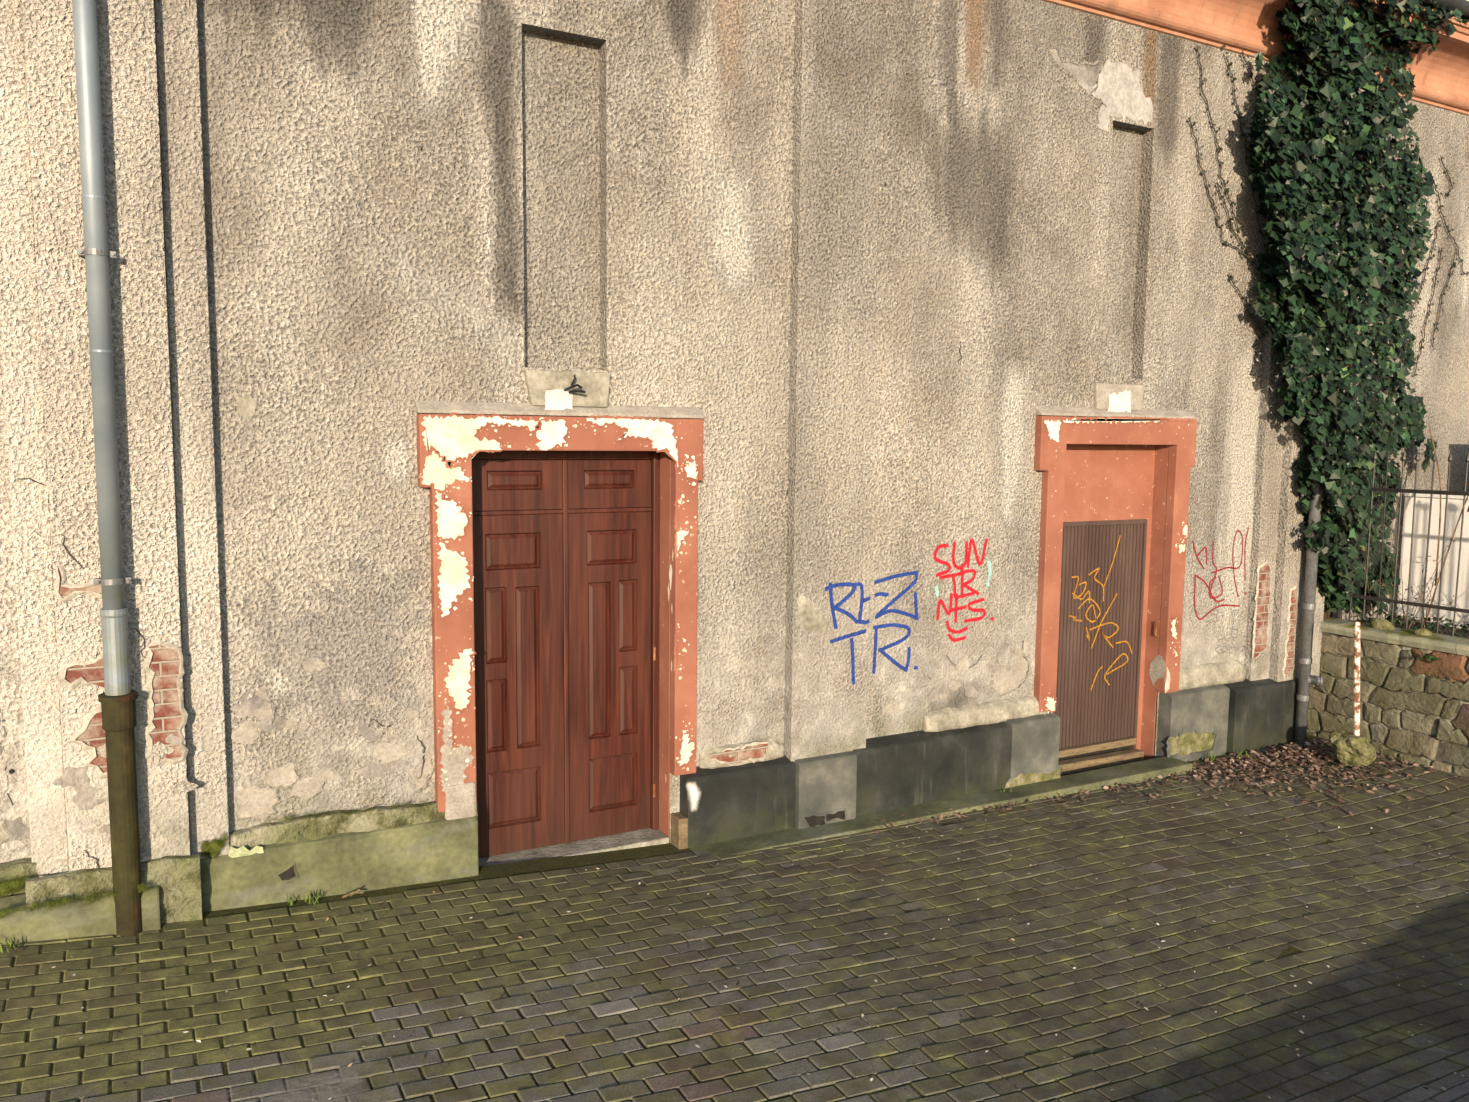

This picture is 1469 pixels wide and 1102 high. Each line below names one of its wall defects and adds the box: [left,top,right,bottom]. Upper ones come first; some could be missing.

peeling [1048,46,1153,132]
peeling [418,389,700,679]
flaking render [58,654,105,690]
flaking render [0,710,30,850]
flaking render [52,707,111,844]